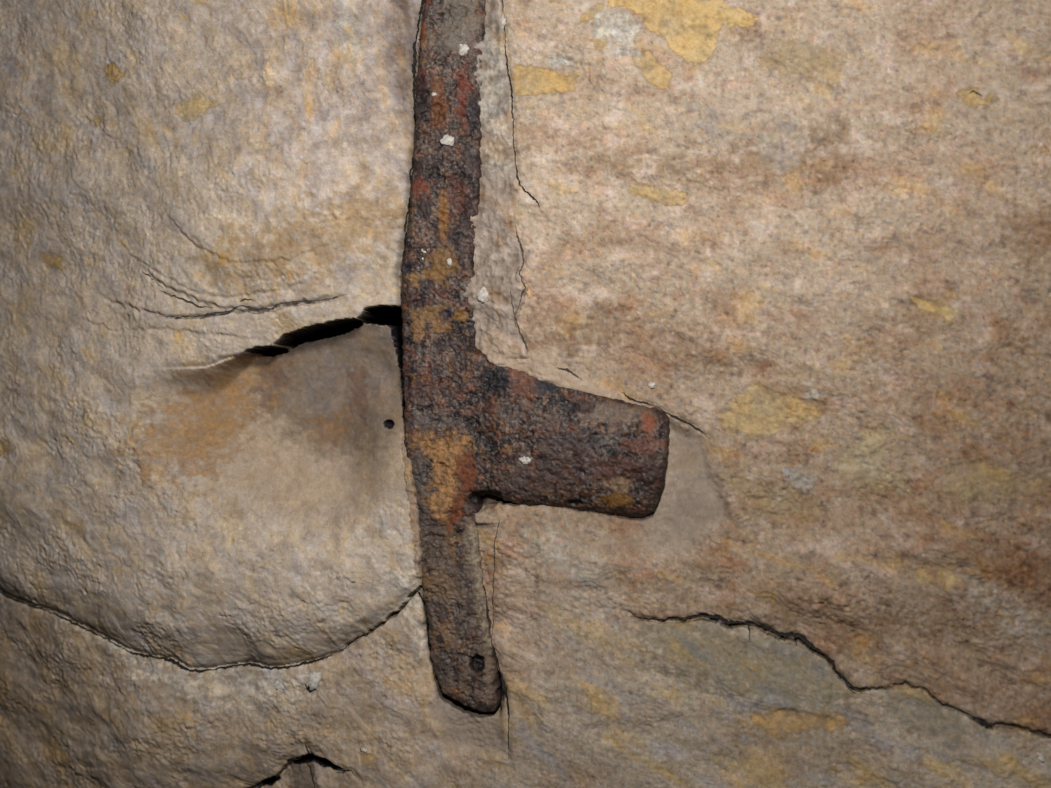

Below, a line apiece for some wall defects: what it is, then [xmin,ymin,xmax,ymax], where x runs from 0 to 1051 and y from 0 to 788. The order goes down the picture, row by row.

crack [142,271,346,318]
rust [406,428,477,531]
crack [0,591,379,673]
crack [630,614,863,690]
crack [906,682,1048,737]
crack [240,744,315,788]